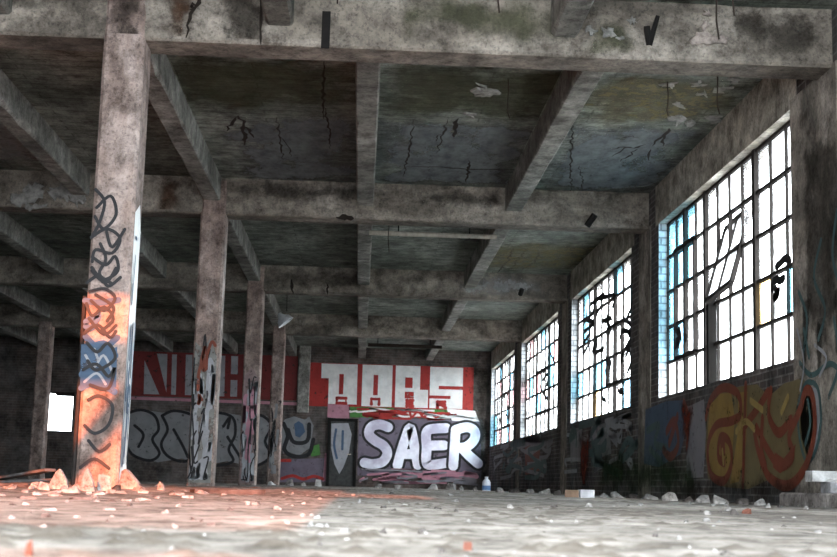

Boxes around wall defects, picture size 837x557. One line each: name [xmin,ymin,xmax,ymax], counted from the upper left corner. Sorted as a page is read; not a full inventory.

crack [186,0,201,38]
crack [226,115,254,145]
crack [321,63,331,148]
crack [403,122,416,176]
crack [436,118,502,182]
spalling [470,82,501,97]